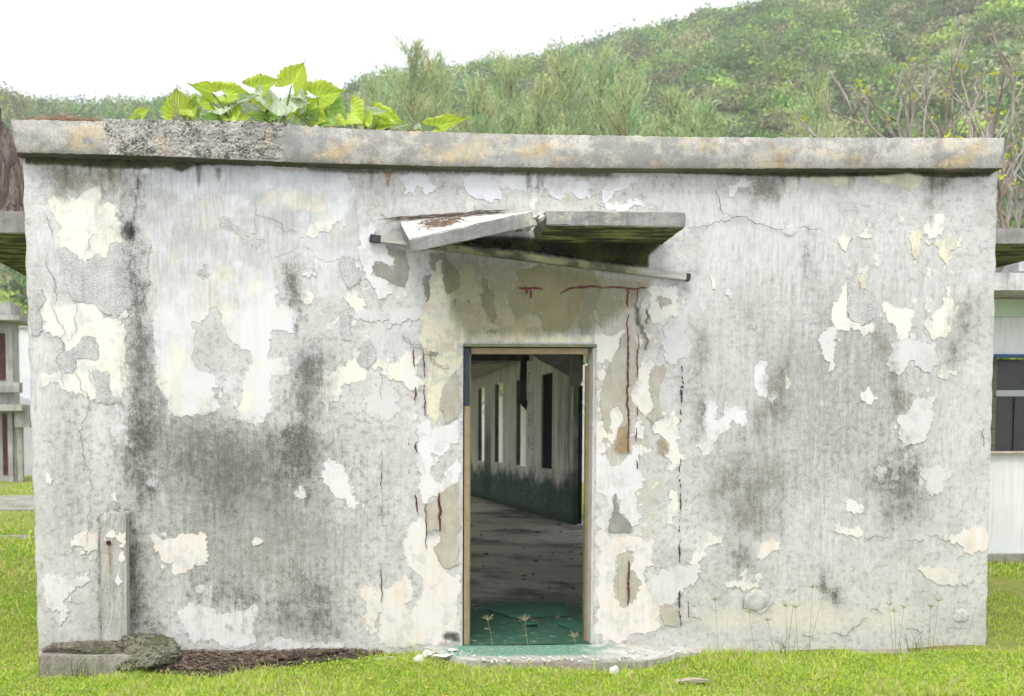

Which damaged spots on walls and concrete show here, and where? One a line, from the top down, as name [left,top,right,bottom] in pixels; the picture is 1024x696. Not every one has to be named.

leakage [123,218,136,239]
crack [687,178,823,231]
peeling [909,212,962,264]
peeling [817,274,960,379]
leakage [125,260,155,499]
leakage [275,352,323,477]
peeling [28,118,723,651]
corrosion [616,427,628,454]
leakage [712,459,784,527]
leakage [870,456,918,510]
peeling [875,387,951,496]
leakage [129,529,160,631]